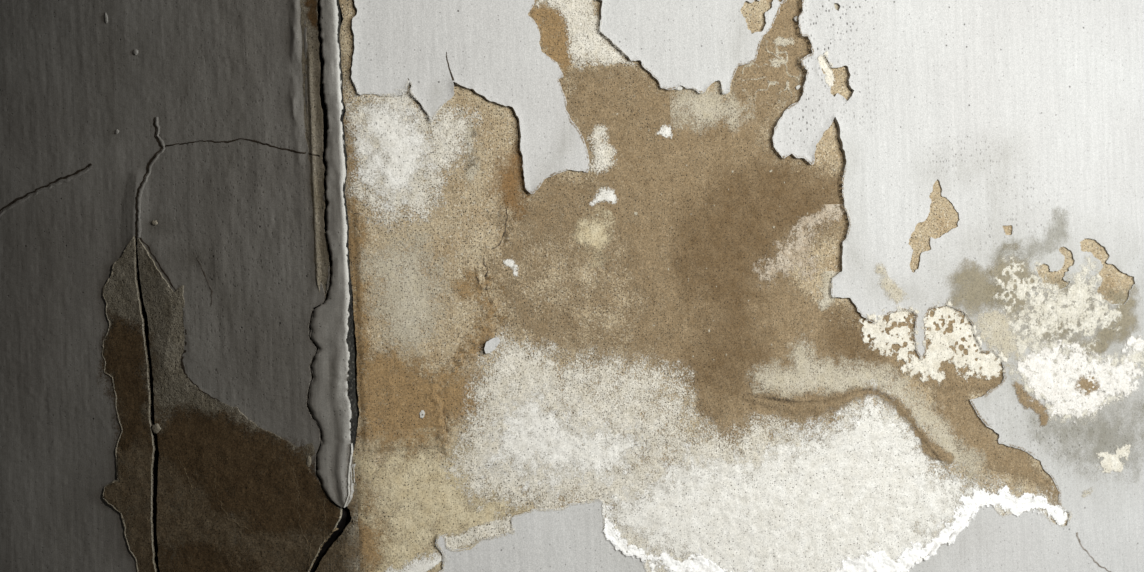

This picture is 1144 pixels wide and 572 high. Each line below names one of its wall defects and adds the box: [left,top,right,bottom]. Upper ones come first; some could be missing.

crack [0,163,94,216]
crack [135,0,342,572]
peeling [300,0,1069,572]
water stain [315,0,1144,572]
crack [352,323,360,417]
crack [307,496,353,572]
crack [1076,532,1111,572]